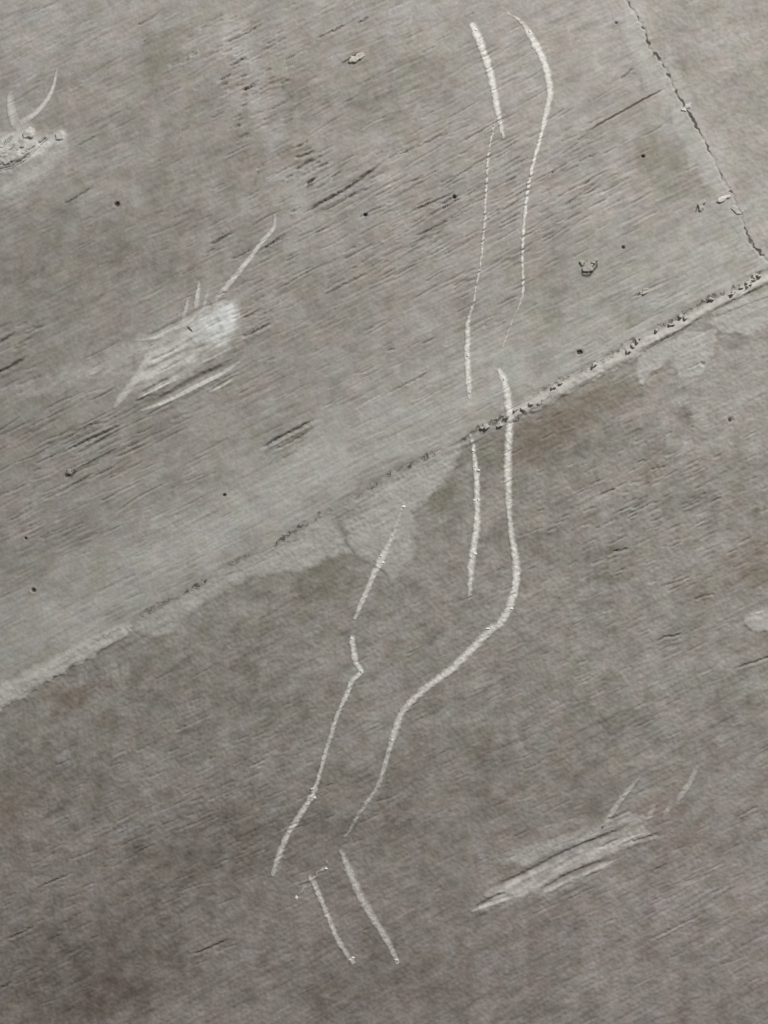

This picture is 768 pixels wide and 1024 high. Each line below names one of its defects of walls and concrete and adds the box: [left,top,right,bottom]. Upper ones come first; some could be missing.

crack [312,16,371,41]
crack [533,1,768,263]
crack [207,129,452,262]
crack [407,191,481,240]
crack [317,270,373,300]
crack [383,368,436,396]
crack [254,415,323,453]
leakage [415,369,647,523]
leakage [709,523,768,597]
leakage [290,555,361,641]
leakage [0,771,48,865]
leakage [32,954,225,1024]